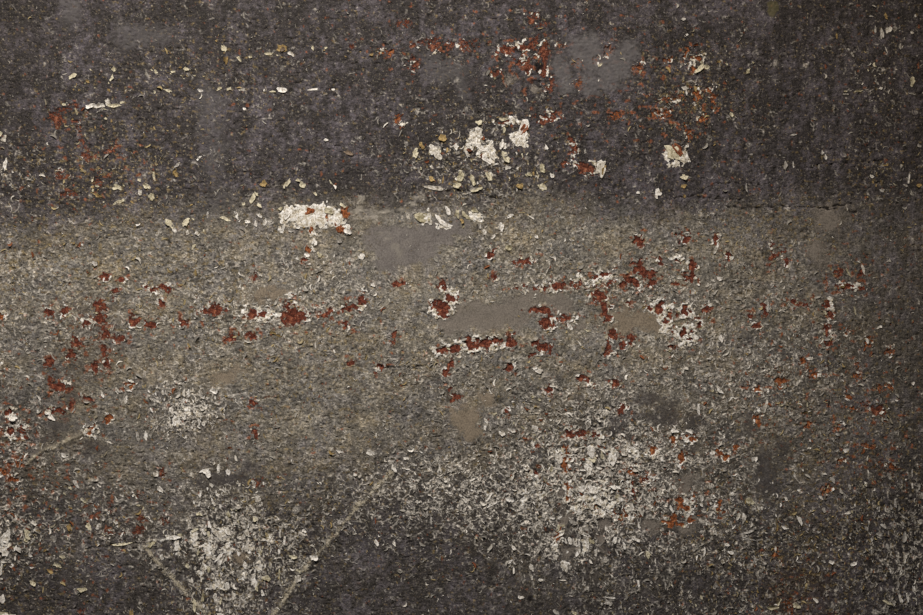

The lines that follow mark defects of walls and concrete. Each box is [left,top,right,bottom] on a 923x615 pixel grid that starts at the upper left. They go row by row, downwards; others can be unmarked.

rust [494,10,567,97]
rust [492,108,564,127]
rust [650,84,721,142]
peeling [394,84,554,302]
peeling [595,160,610,179]
rust [200,286,368,342]
rust [426,278,460,320]
rust [511,229,716,360]
rust [786,261,868,349]
rust [37,271,174,416]
rust [429,332,517,377]
rust [0,407,30,441]